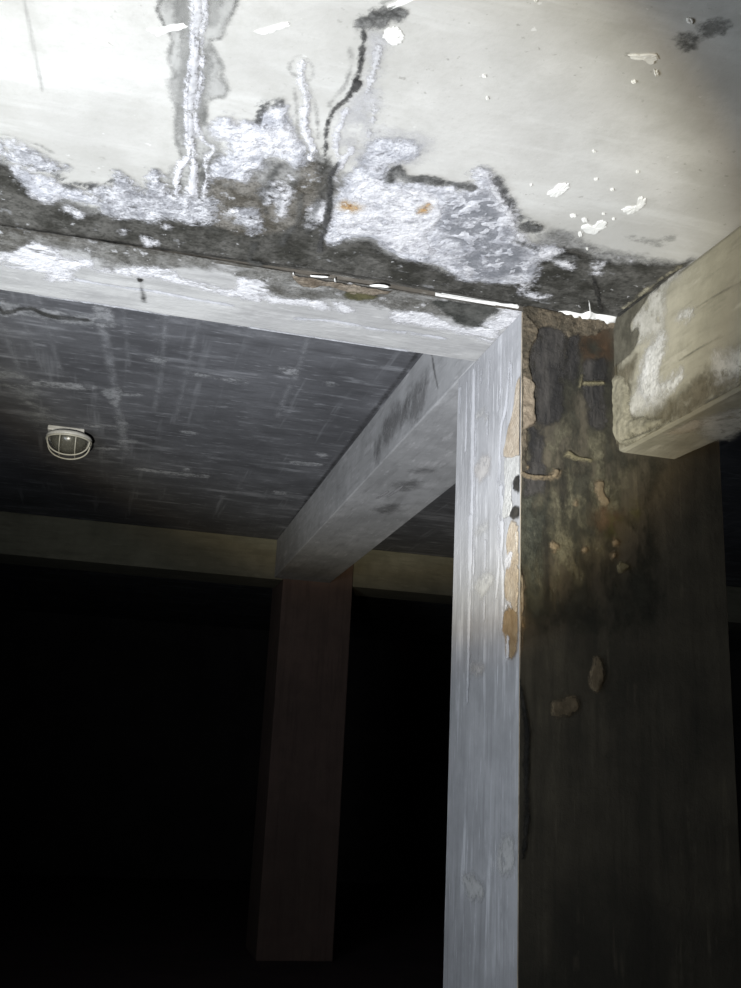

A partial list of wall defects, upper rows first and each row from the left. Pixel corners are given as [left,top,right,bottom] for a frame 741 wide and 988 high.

crack [316,6,408,253]
crack [0,301,117,328]
damp [0,0,741,630]
flaking render [502,306,615,659]